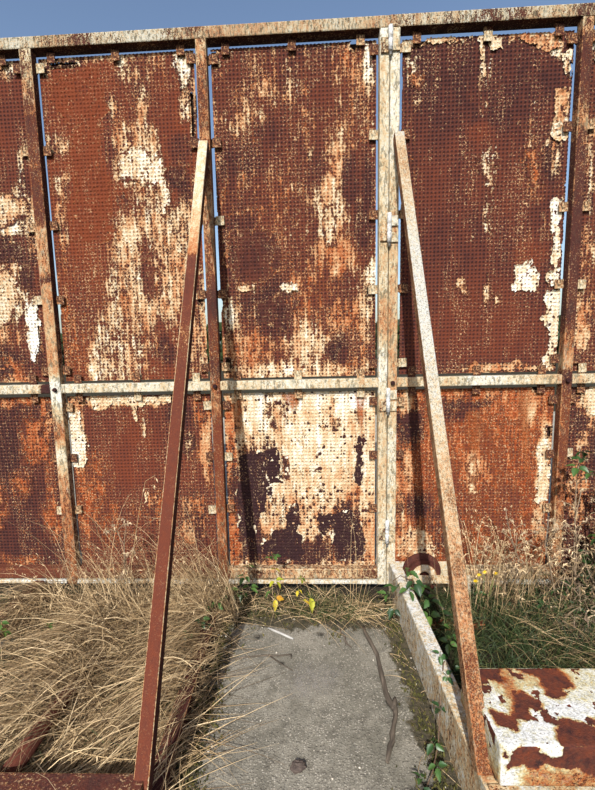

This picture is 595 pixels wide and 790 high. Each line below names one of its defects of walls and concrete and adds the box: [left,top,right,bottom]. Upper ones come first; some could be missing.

peeling [116,145,174,218]
corrosion [137,239,160,301]
corrosion [221,229,283,285]
peeling [453,275,471,297]
peeling [468,197,564,373]
corrosion [255,289,299,332]
corrosion [0,362,15,381]
corrosion [36,345,44,370]
corrosion [327,335,349,365]
corrosion [398,409,425,441]